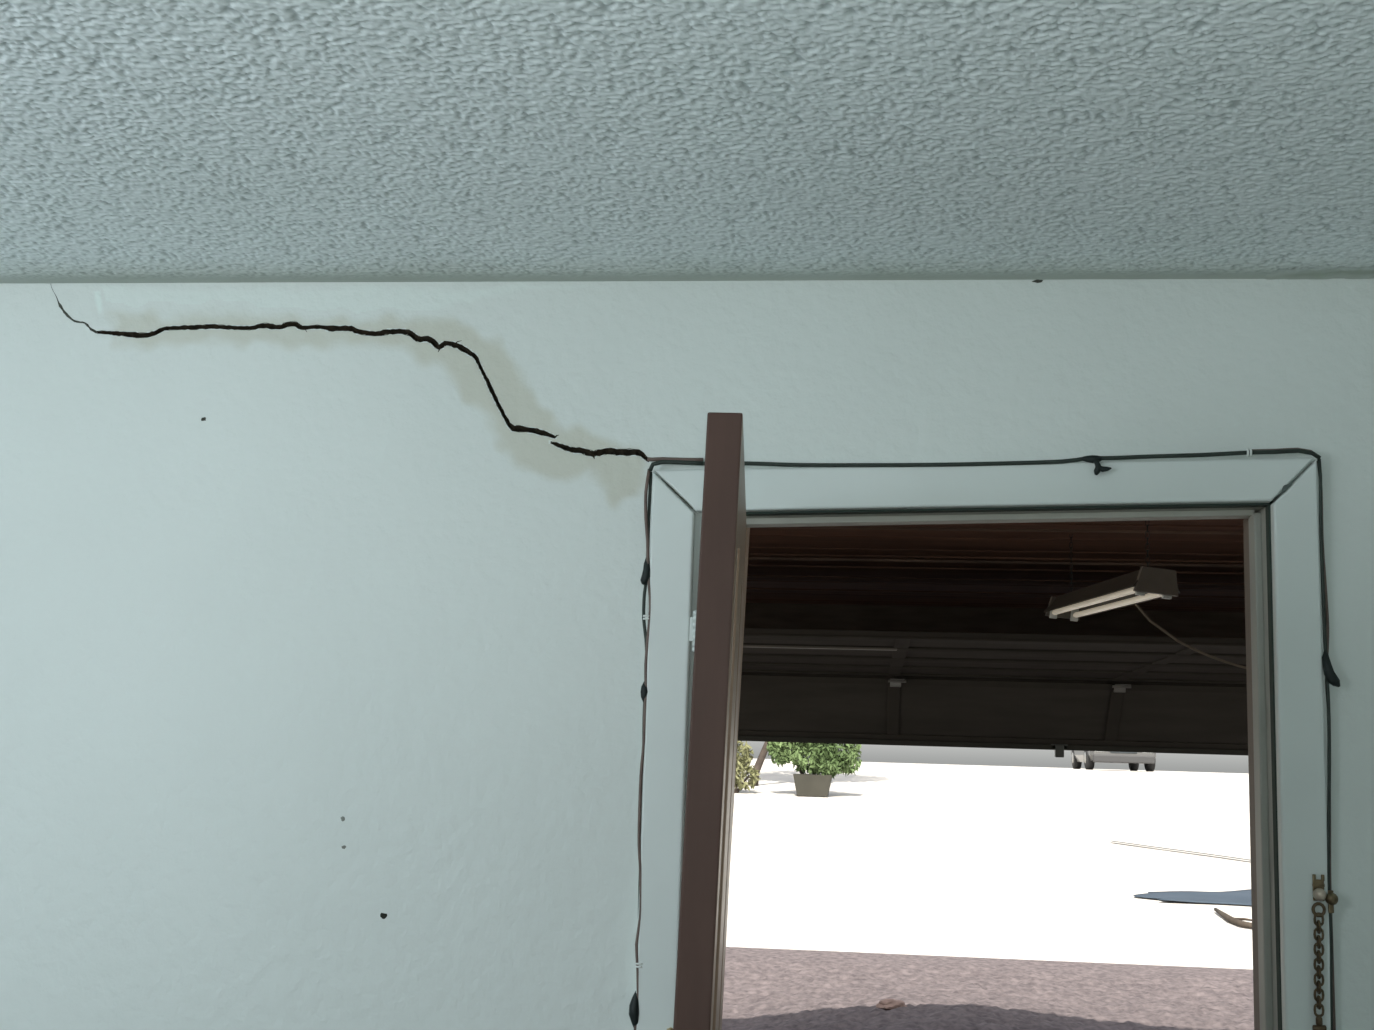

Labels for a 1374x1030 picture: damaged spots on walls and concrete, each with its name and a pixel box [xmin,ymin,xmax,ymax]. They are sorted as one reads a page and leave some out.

crack [51,286,693,509]
damp [98,300,654,519]